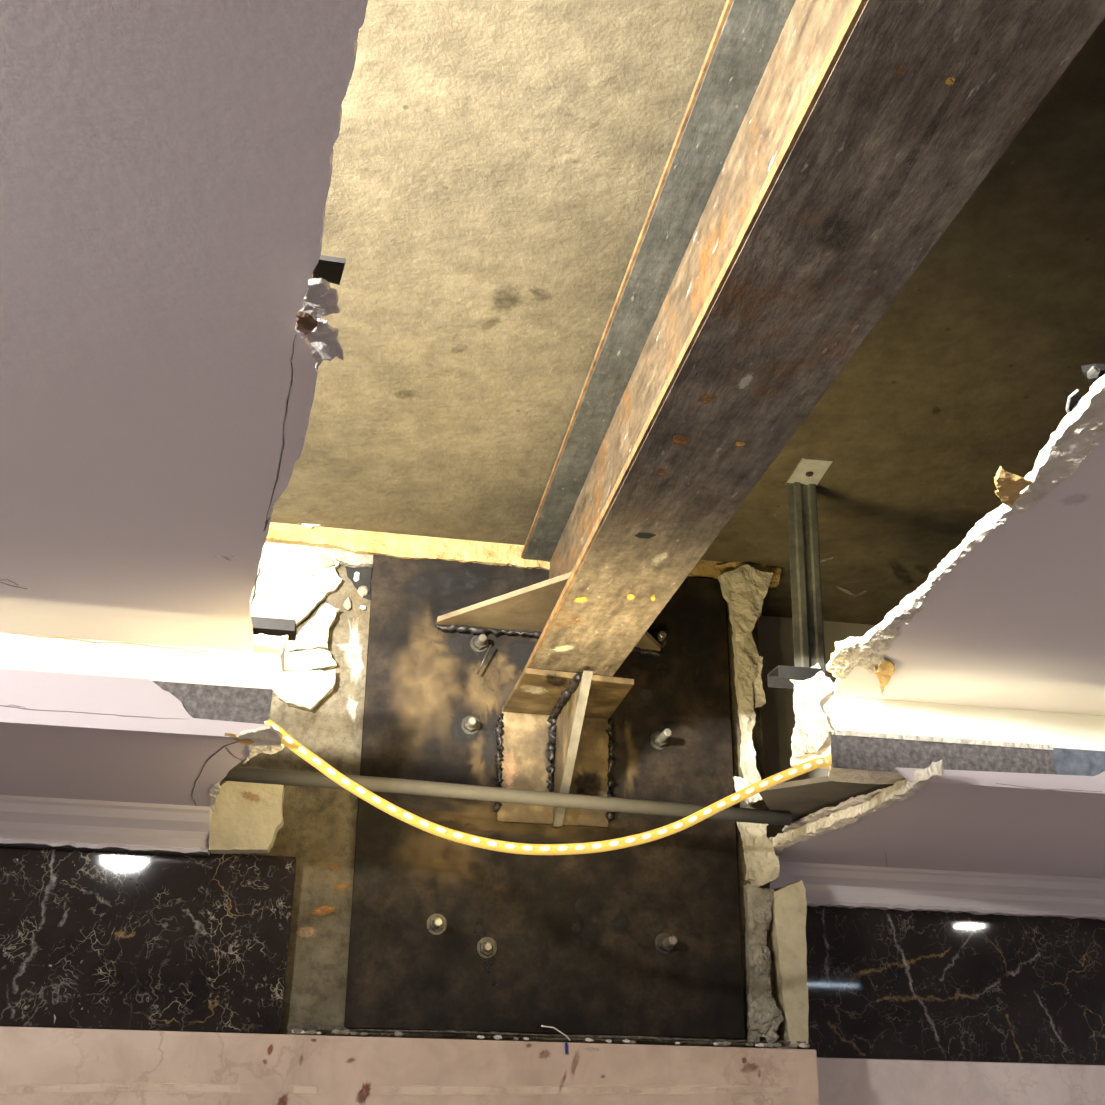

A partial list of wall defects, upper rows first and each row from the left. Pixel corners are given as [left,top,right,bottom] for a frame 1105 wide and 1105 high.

flaking render [208,781,284,854]
spalling [225,364,1105,1045]